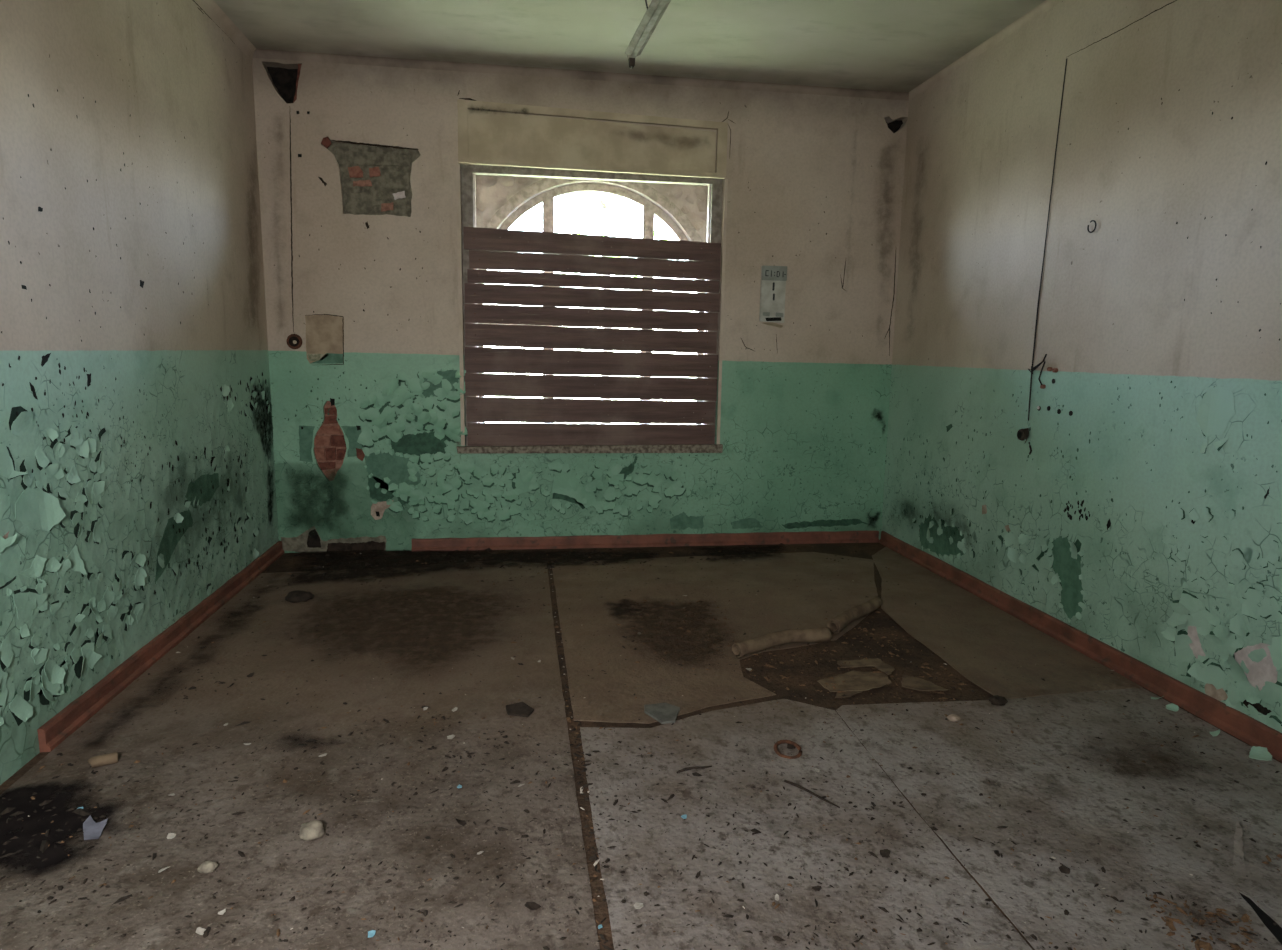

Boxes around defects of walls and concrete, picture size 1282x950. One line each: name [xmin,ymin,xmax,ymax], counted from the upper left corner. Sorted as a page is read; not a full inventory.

crack [1068,0,1177,57]
spalling [319,137,420,229]
peeling [220,372,273,439]
peeling [281,366,836,553]
peeling [0,353,260,726]
damp [292,473,344,528]
peeling [782,515,867,529]
damp [608,599,725,664]
damp [0,782,117,876]